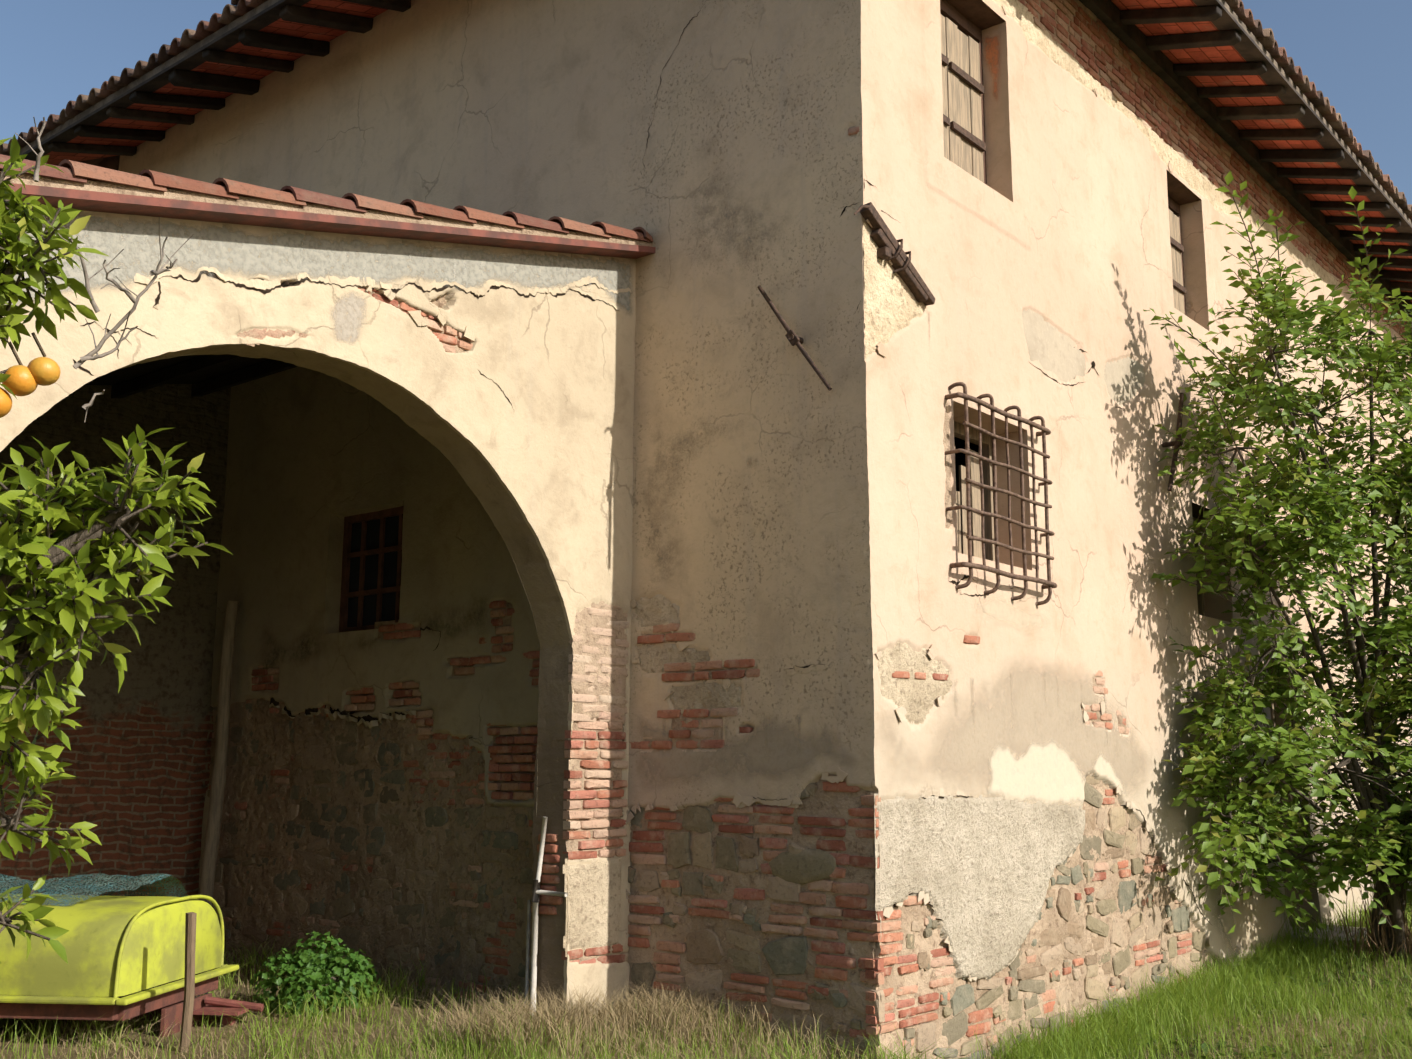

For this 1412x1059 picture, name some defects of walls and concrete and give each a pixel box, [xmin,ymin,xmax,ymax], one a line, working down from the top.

flaking render [992,0,1412,341]
crack [73,266,631,376]
flaking render [358,284,476,353]
flaking render [863,218,924,360]
flaking render [1103,356,1145,406]
flaking render [207,601,1220,1059]